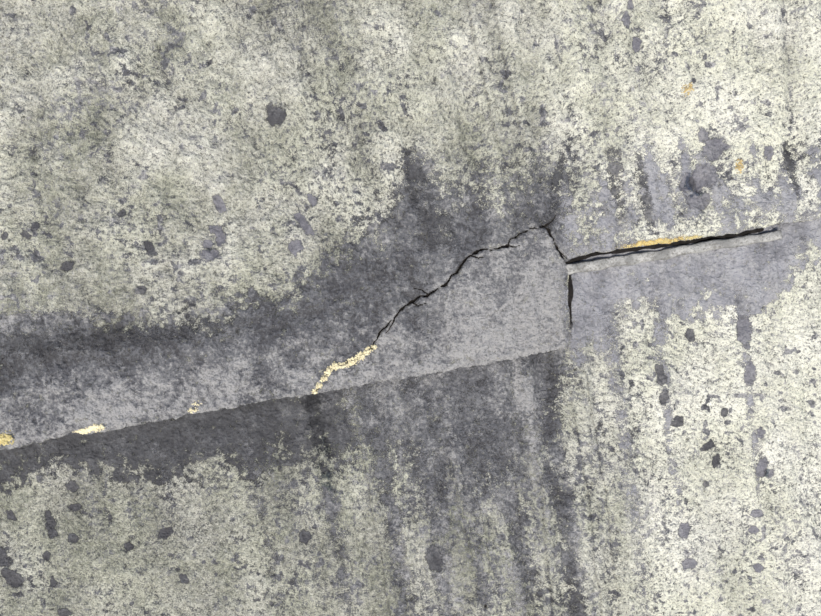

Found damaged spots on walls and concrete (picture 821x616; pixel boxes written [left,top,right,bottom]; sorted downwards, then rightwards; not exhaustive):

damp [0,124,821,616]
crack [370,215,568,349]